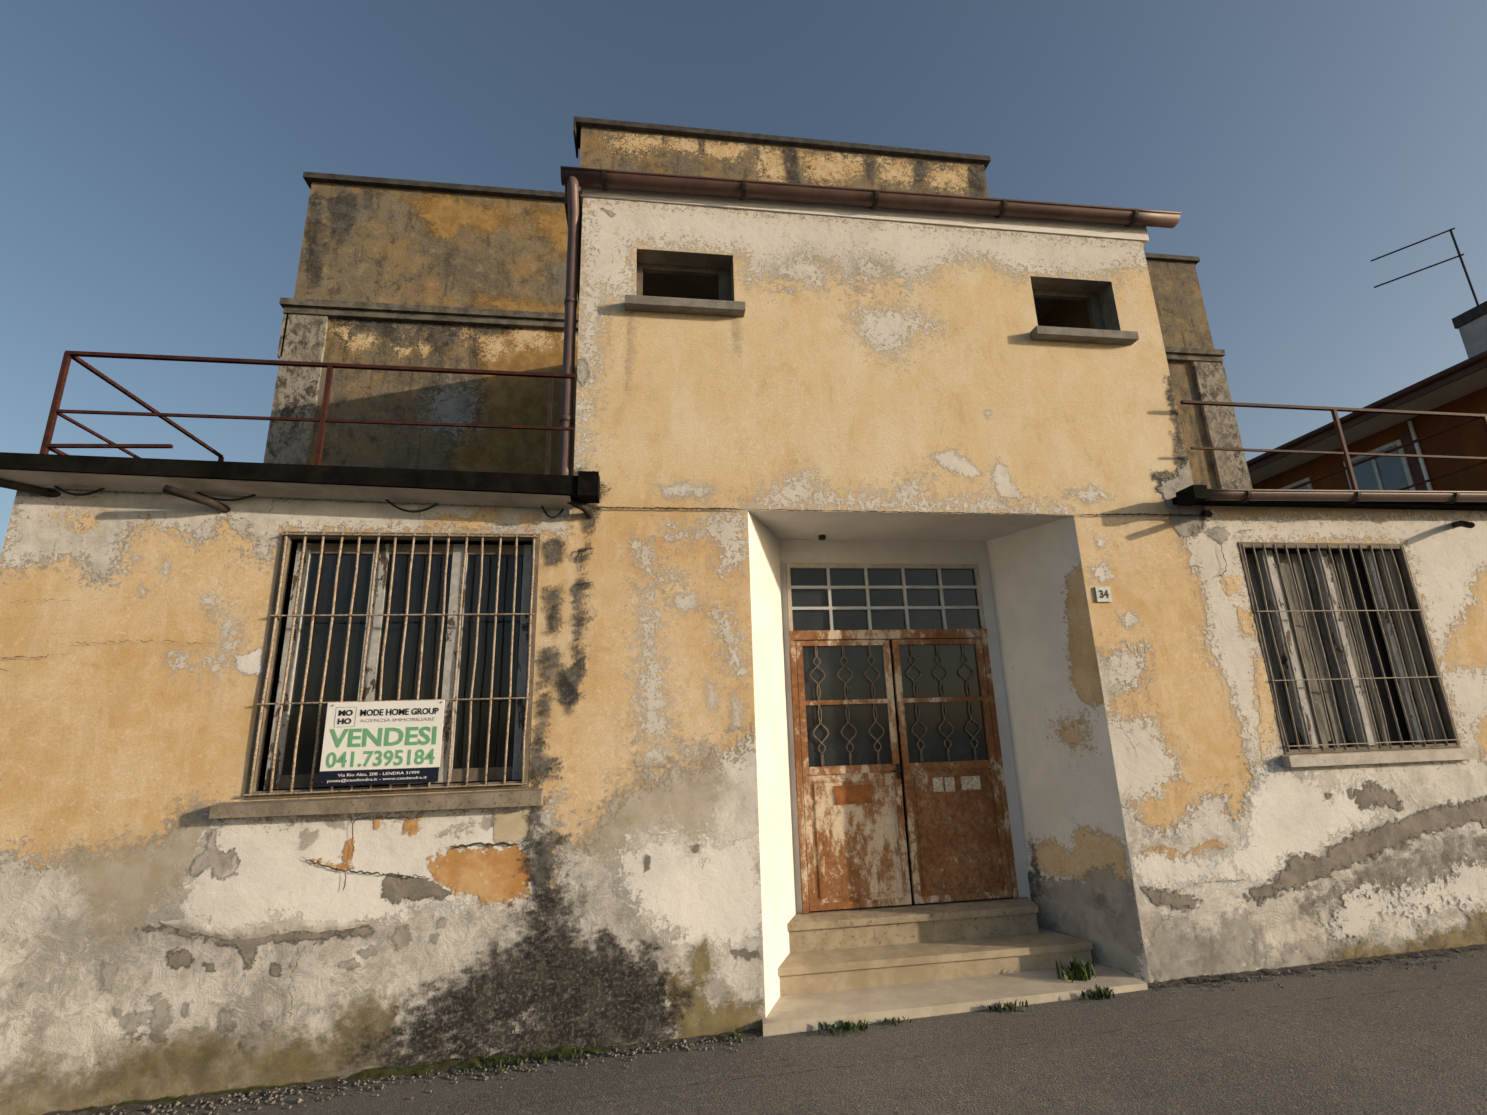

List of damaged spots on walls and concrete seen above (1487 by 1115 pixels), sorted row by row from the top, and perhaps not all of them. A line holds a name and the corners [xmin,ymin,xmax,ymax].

peeling [329,197,1148,485]
water stain [0,467,763,1115]
peeling [0,445,1119,1114]
peeling [1028,456,1487,983]
water stain [1144,826,1487,983]